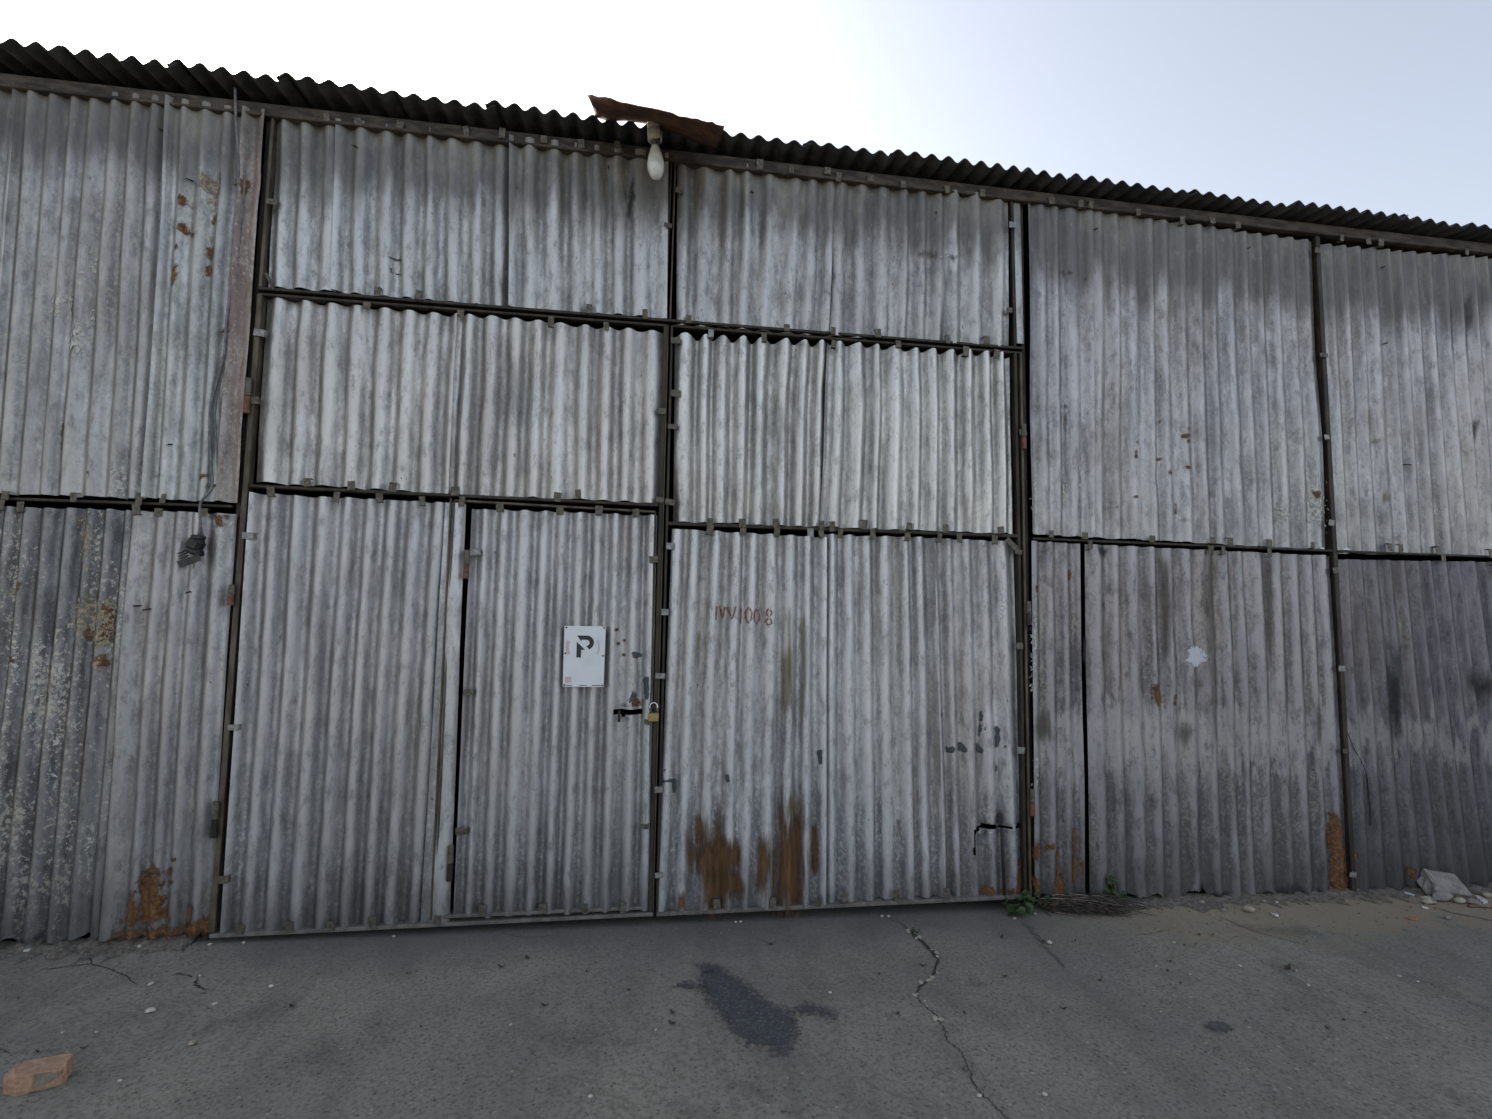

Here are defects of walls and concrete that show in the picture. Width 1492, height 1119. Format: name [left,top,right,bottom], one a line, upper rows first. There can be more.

corrosion [111,858,217,941]
corrosion [688,805,818,917]
corrosion [1277,813,1357,895]
crack [880,915,1009,1119]